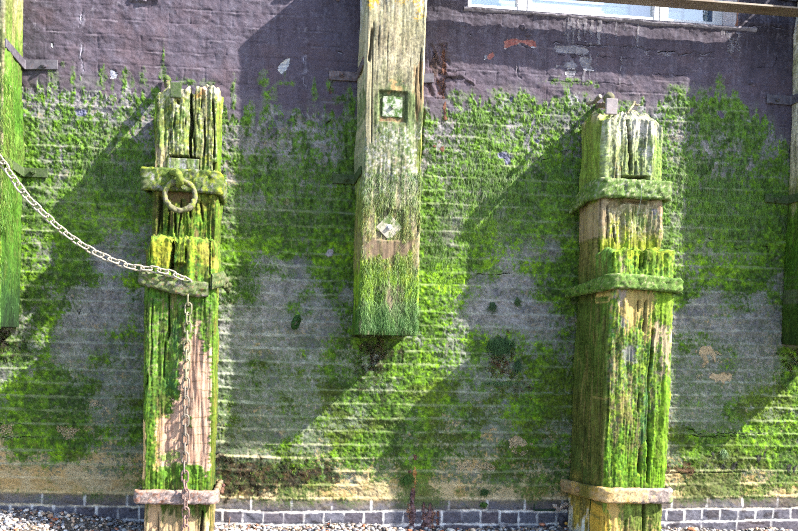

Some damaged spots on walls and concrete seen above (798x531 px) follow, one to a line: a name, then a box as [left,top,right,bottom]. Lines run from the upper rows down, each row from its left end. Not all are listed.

spalling [504,38,536,49]
spalling [554,45,594,77]
rust [424,45,448,121]
crack [689,429,760,438]